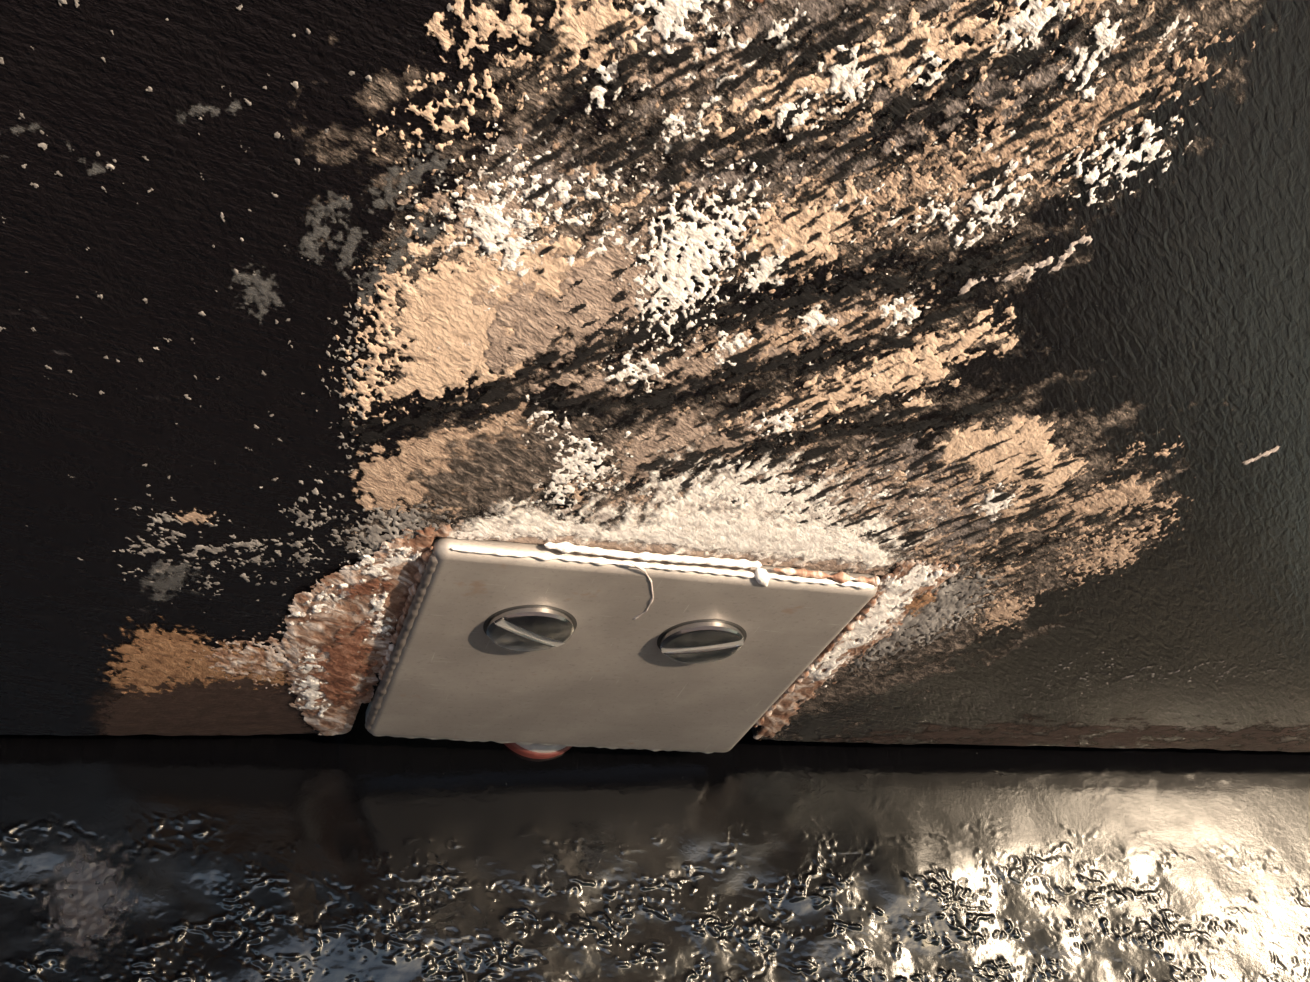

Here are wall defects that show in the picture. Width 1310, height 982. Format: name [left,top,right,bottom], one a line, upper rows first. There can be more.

damp [300,143,449,306]
peeling [112,0,1276,742]
damp [341,0,1205,599]
rust [89,575,394,736]
rust [817,714,1310,752]